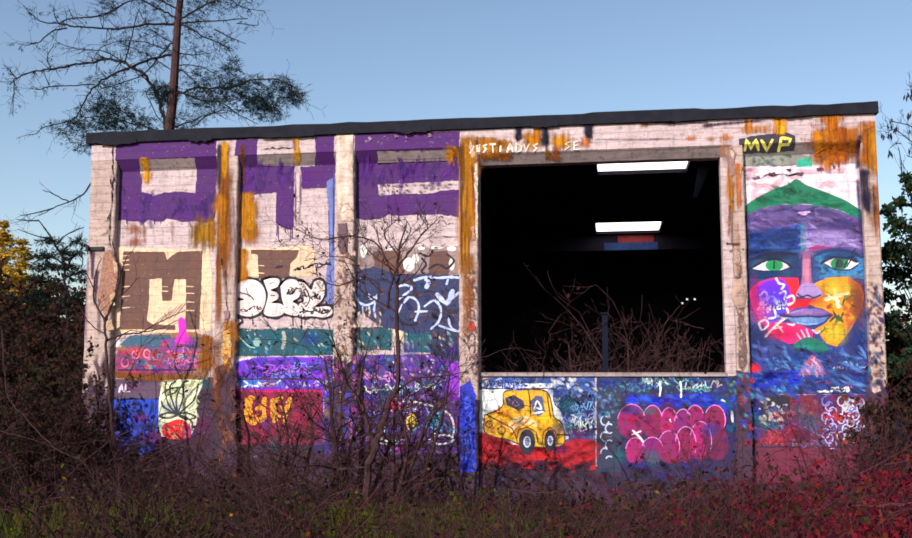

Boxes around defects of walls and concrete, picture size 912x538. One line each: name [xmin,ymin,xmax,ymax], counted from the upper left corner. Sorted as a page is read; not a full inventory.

corrosion [140,158,150,184]
corrosion [523,130,589,161]
corrosion [808,115,880,233]
corrosion [191,142,259,406]
corrosion [446,137,511,334]
corrosion [117,372,186,382]